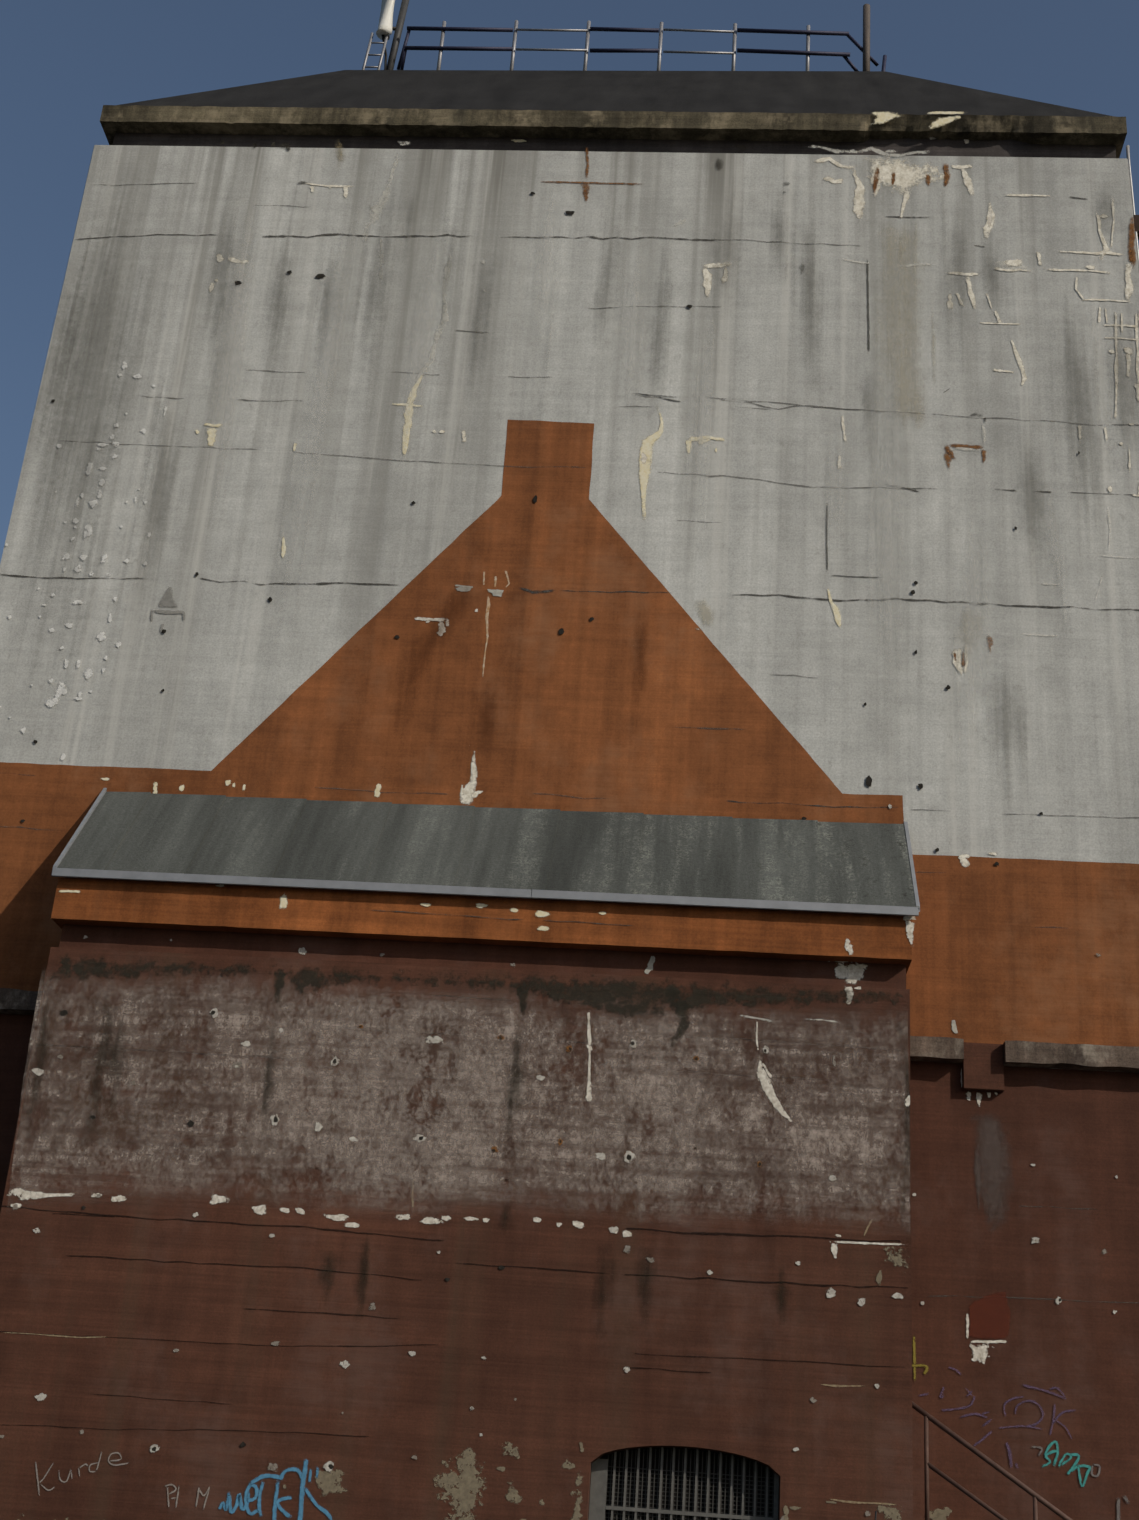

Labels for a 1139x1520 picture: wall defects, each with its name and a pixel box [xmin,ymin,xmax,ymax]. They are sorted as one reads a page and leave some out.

corrosion [542,149,637,201]
leakage [816,157,974,218]
crack [263,205,466,238]
corrosion [1128,217,1136,264]
crack [515,236,870,350]
leakage [947,200,1139,469]
corrosion [945,444,986,467]
crack [664,472,1139,611]
spalling [829,939,868,1004]
leakage [12,957,910,1209]
spalling [966,1314,1006,1364]
peeling [433,1433,545,1520]